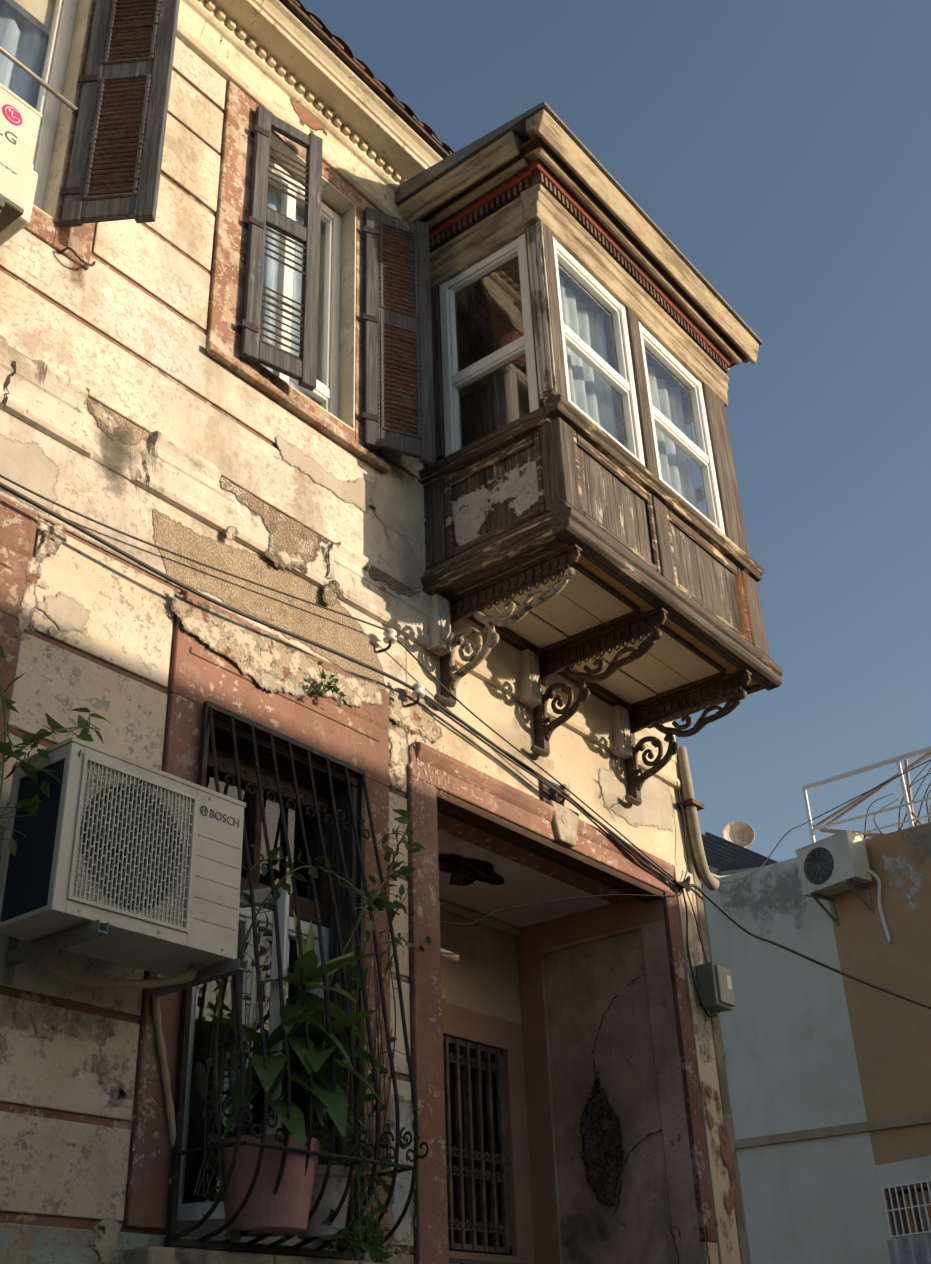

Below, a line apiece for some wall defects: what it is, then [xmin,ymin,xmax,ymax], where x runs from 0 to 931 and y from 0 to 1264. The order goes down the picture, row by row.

crack [3,358,21,412]
flaking render [0,434,90,642]
damp [102,430,129,471]
flaking render [276,436,426,546]
peeling [452,460,539,546]
flaking render [151,508,454,828]
flaking render [599,766,675,832]
crack [592,976,641,1075]
peeling [391,1095,417,1252]
crack [611,1125,688,1218]
flaking render [91,1215,126,1264]
crack [669,1223,710,1264]